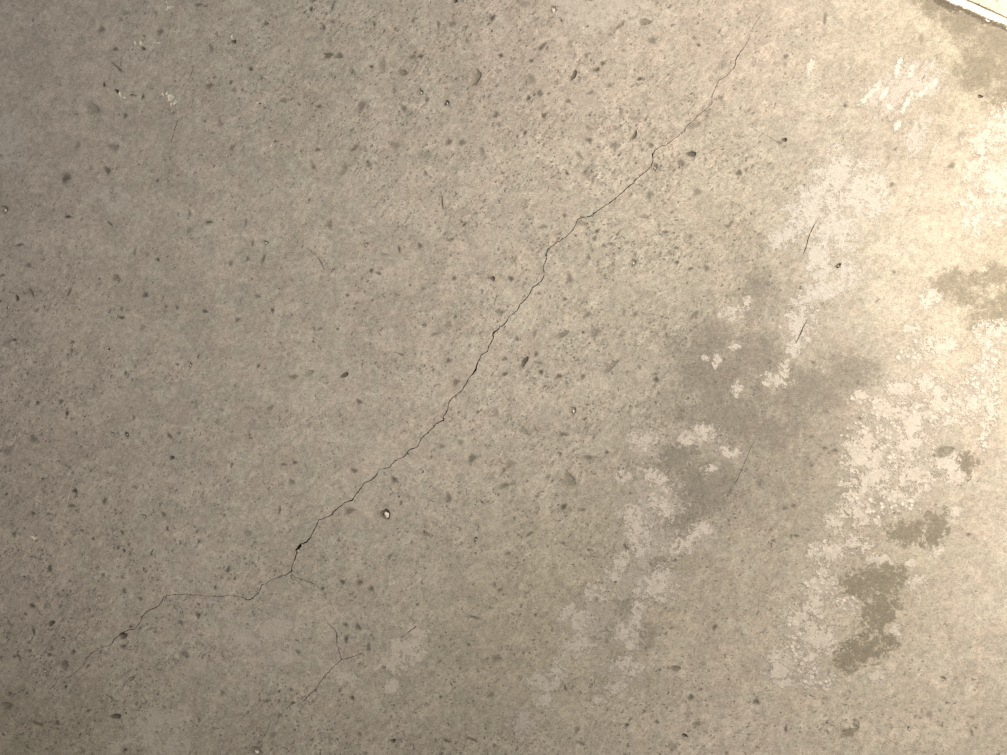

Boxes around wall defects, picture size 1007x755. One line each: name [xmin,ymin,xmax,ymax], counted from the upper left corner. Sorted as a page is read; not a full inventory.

leakage [855,0,1007,237]
crack [50,20,758,698]
leakage [504,421,742,744]
leakage [696,343,741,370]
leakage [715,295,752,323]
leakage [730,379,744,398]
leakage [756,142,891,388]
leakage [759,318,1007,691]
leakage [918,286,945,313]
leakage [841,718,860,737]